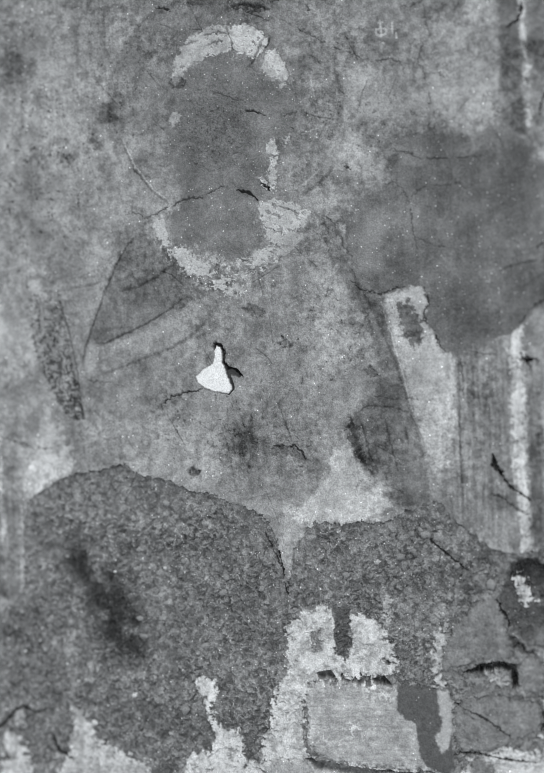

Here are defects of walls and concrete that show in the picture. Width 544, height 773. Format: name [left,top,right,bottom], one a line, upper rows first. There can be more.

crack [505,0,524,29]
peeling [129,0,292,91]
crack [271,0,447,134]
crack [128,183,270,233]
crack [317,213,466,397]
crack [516,300,544,327]
spalling [195,341,244,397]
crack [159,387,206,409]
crack [490,453,534,517]
spalling [0,460,544,773]
crack [0,704,47,729]
crack [50,731,76,762]